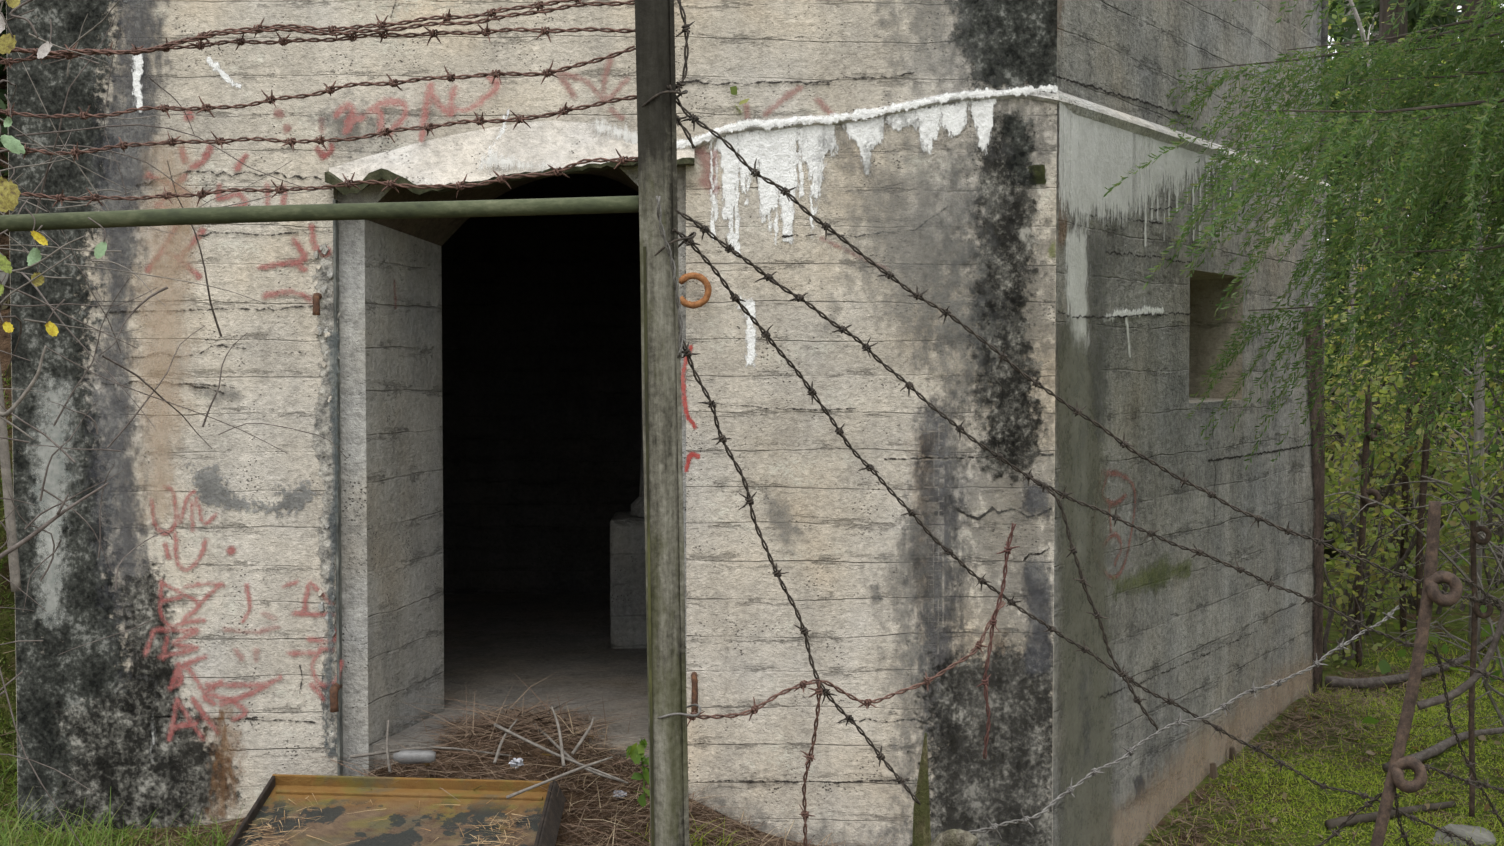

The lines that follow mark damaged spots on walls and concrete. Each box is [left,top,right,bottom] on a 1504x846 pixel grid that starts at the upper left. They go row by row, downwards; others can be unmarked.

water stain [6,0,245,832]
water stain [677,0,1247,846]